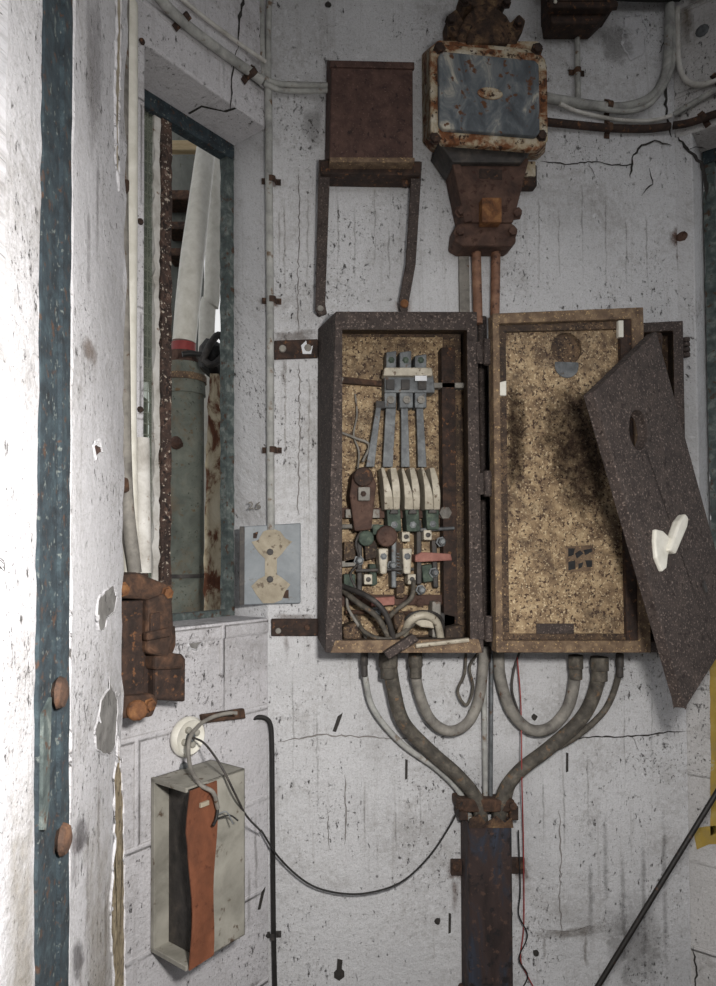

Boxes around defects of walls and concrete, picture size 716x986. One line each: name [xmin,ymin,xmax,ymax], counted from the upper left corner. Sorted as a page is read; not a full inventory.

crack [189,0,245,114]
crack [541,161,634,176]
peeling [95,585,119,633]
flaking render [94,676,126,986]
crack [691,952,699,986]